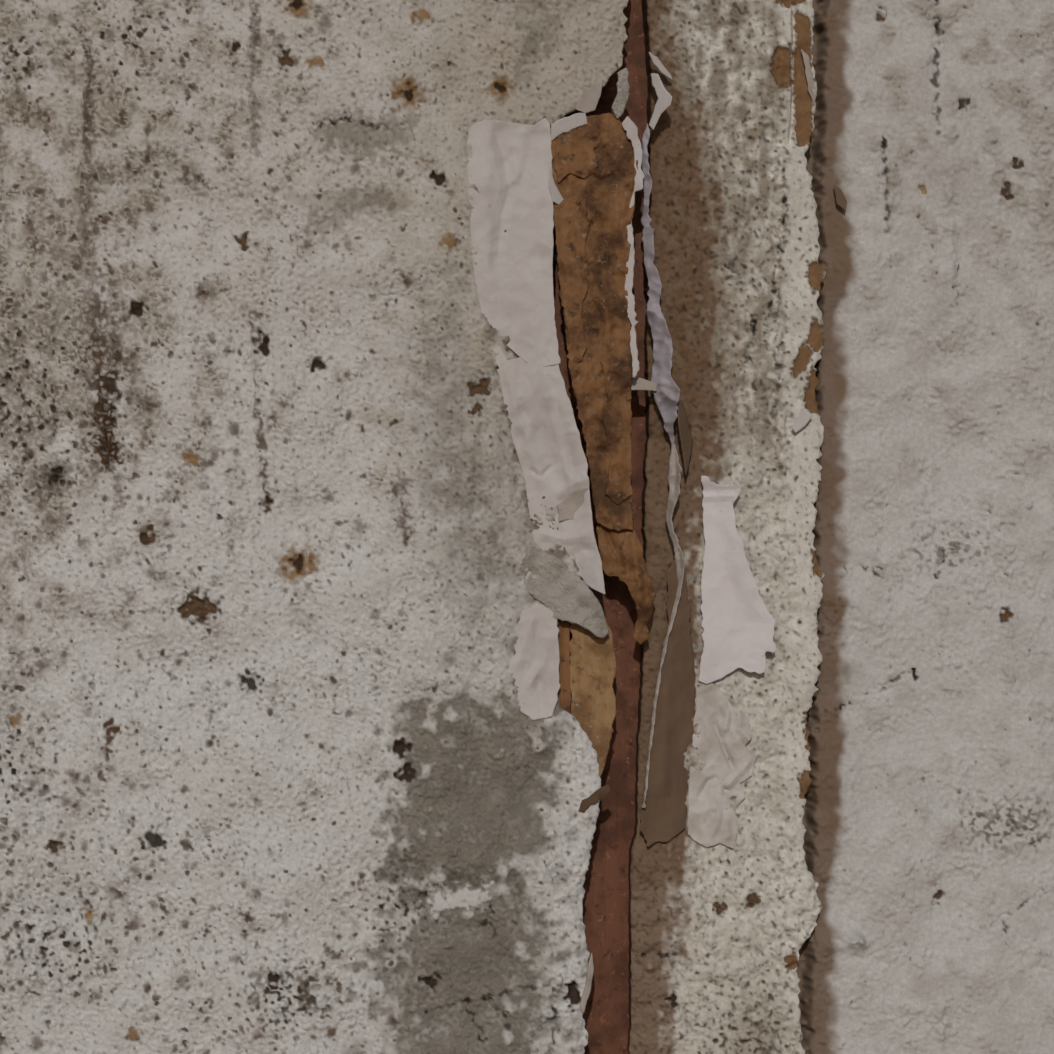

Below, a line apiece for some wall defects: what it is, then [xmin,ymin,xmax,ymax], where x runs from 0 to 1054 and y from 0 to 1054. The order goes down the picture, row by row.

flaking render [611,68,630,119]
spalling [769,0,813,147]
spalling [805,262,824,295]
hole [467,378,490,415]
spalling [791,318,823,415]
peeling [520,546,609,639]